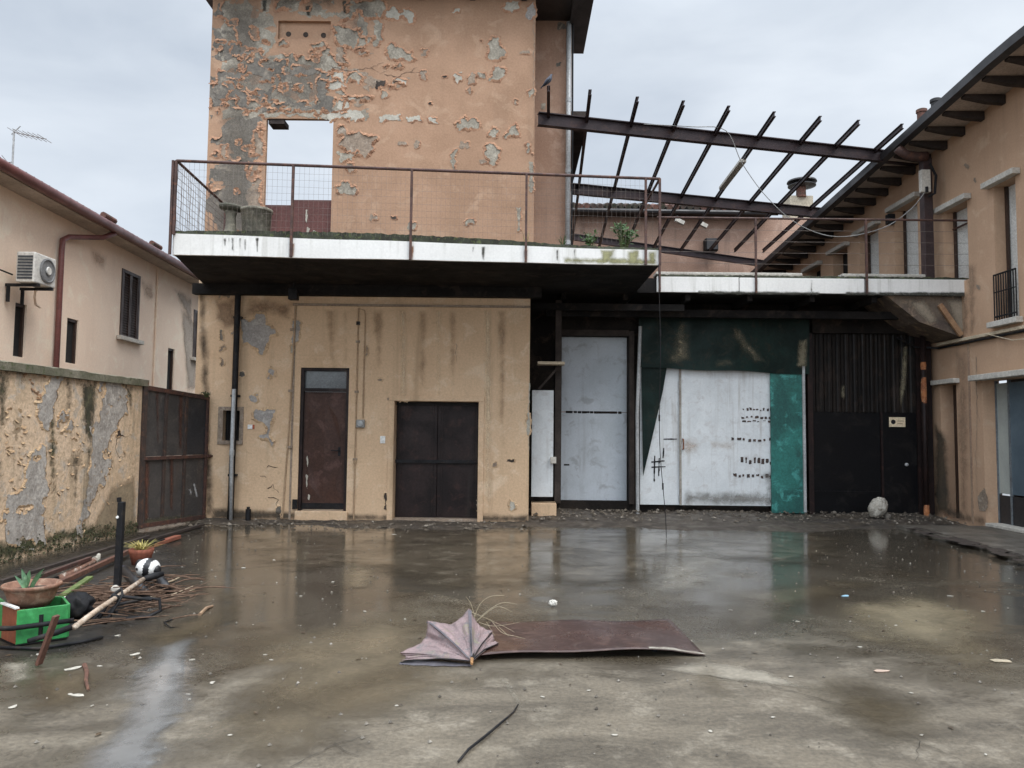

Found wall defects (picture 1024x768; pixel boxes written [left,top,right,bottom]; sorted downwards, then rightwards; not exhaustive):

peeling [206,0,439,206]
peeling [441,35,532,95]
peeling [449,114,536,194]
leakage [557,251,655,264]
peeling [0,368,129,550]
peeling [249,392,277,448]